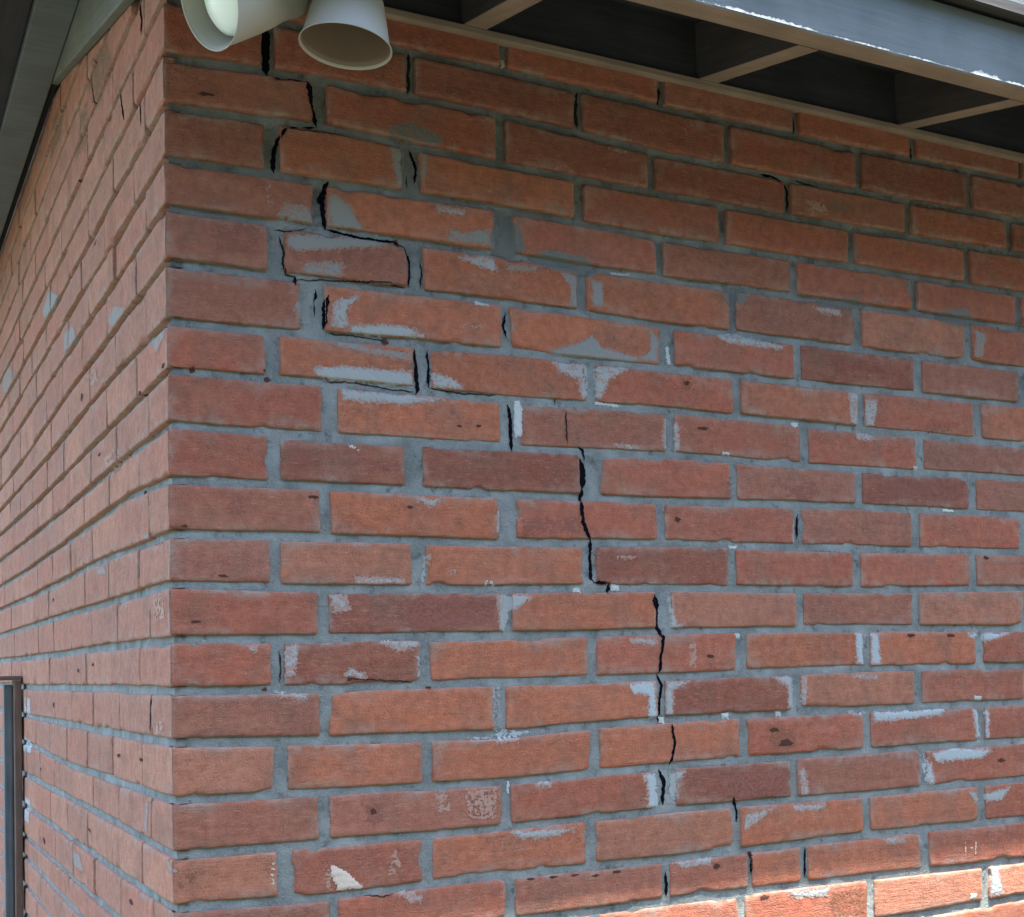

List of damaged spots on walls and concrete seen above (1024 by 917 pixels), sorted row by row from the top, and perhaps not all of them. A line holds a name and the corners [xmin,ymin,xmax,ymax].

crack [404,53,412,94]
crack [261,31,362,173]
crack [572,92,580,128]
crack [406,151,417,189]
crack [761,174,817,211]
crack [277,181,423,342]
crack [325,349,513,451]
crack [554,399,610,593]
crack [349,676,409,684]
crack [652,594,676,805]
crack [662,872,670,895]